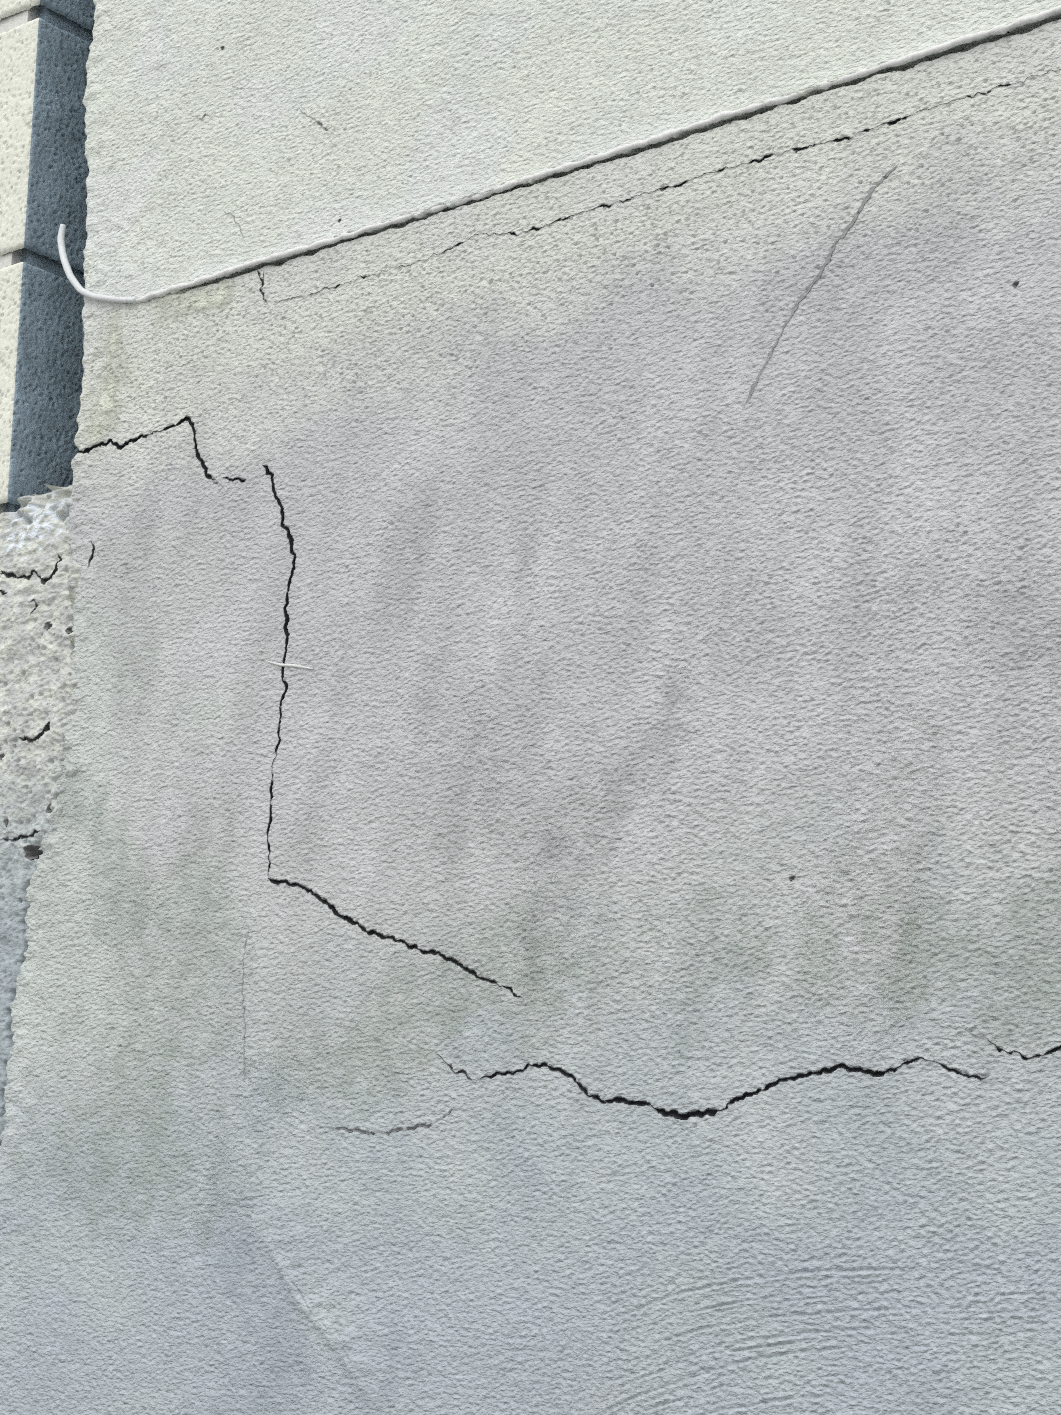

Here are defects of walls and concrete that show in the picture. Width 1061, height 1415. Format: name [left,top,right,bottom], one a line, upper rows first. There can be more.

crack [78,416,524,999]
spalling [23,846,43,859]
crack [241,931,249,1084]
crack [328,1030,1061,1135]